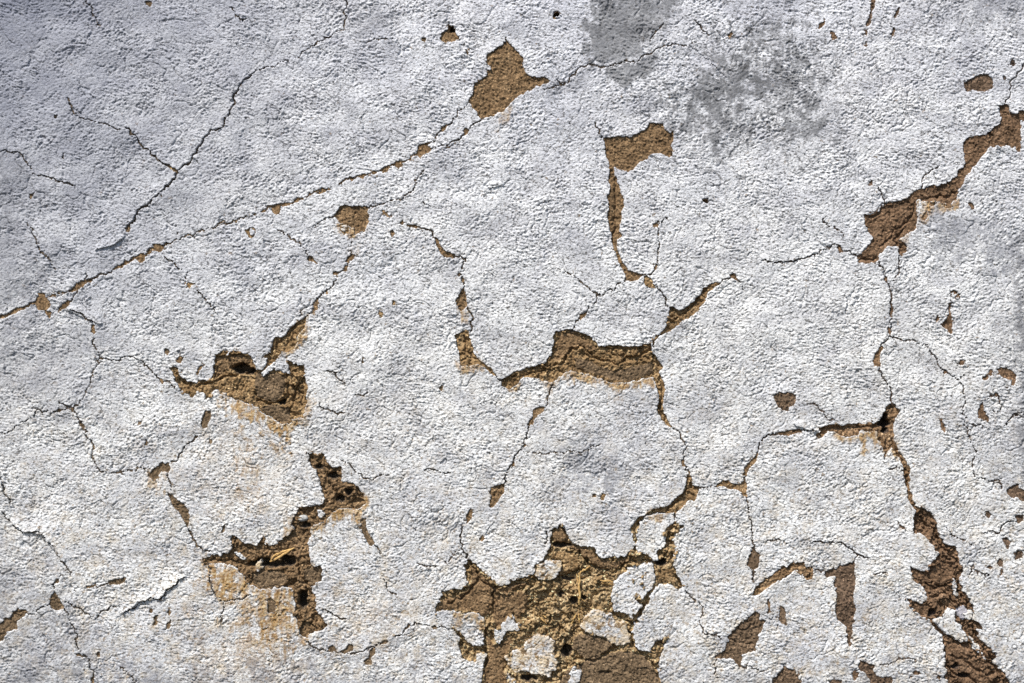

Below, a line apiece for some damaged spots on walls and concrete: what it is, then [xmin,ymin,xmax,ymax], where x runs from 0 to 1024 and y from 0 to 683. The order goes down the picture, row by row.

spalling [468,37,550,119]
spalling [819,59,1024,281]
crack [0,0,484,472]
crack [564,217,668,333]
crack [764,254,818,264]
spalling [317,122,1009,683]
crack [873,260,1024,489]
spalling [98,317,382,638]
crack [95,562,251,624]
crack [306,609,449,665]
crack [813,540,888,575]
flaking render [986,538,1024,576]